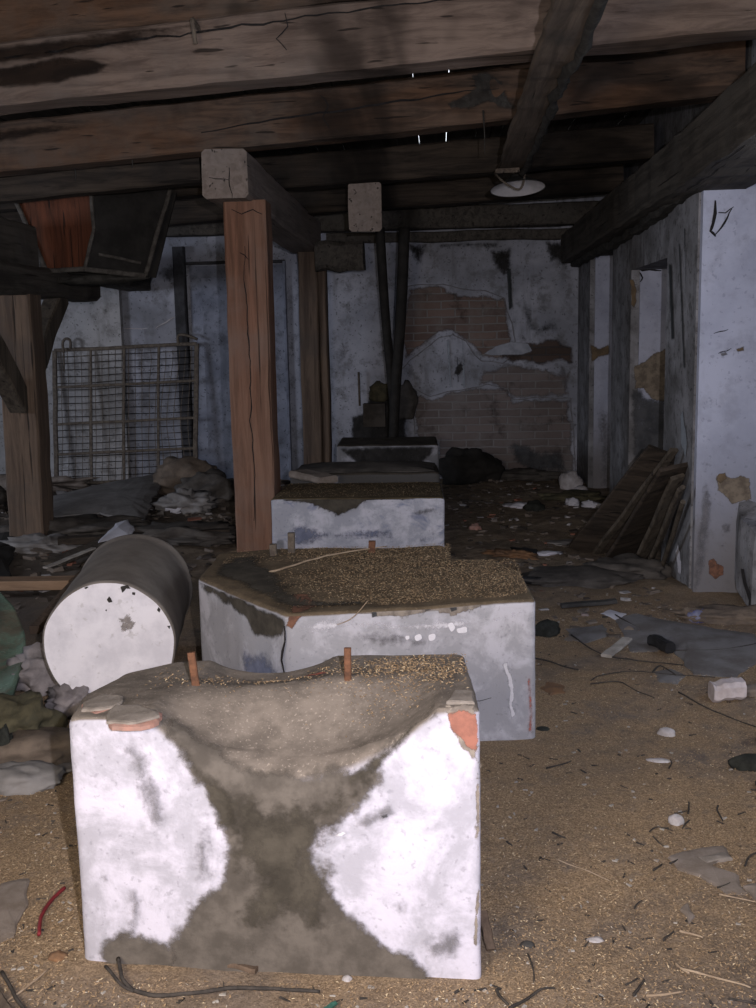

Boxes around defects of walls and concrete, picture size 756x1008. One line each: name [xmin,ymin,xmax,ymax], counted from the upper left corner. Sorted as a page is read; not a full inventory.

leakage [0,29,163,87]
crack [3,0,451,59]
crack [709,200,734,237]
crack [241,253,255,518]
flaking render [352,284,576,472]
flaking render [697,476,751,579]
spalling [81,694,162,731]
spalling [446,690,479,758]
leakage [101,719,430,979]
leakage [431,935,457,953]